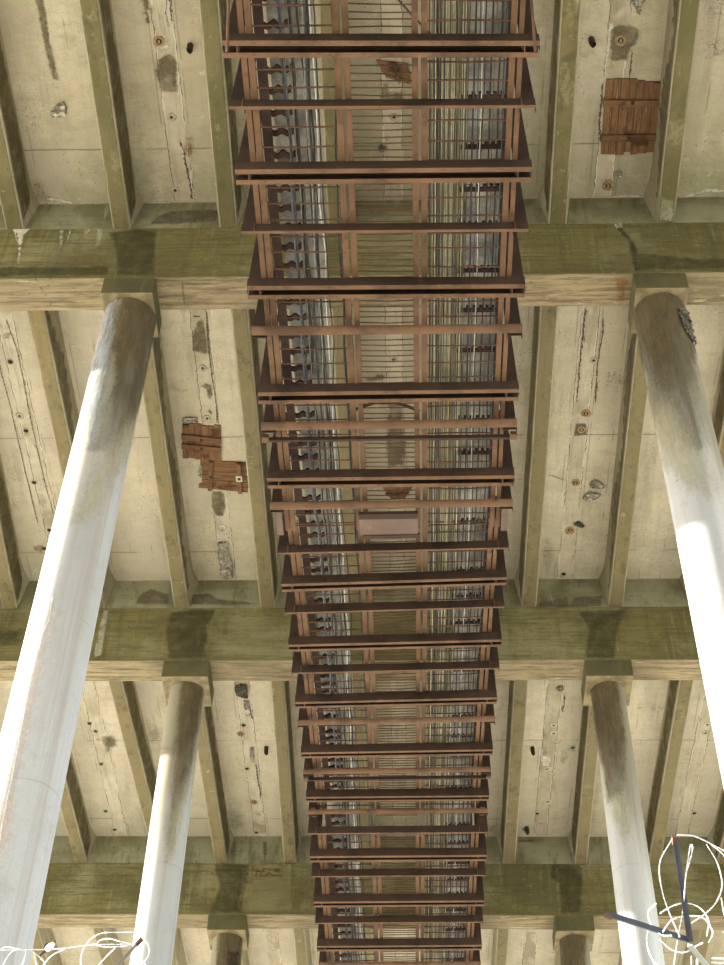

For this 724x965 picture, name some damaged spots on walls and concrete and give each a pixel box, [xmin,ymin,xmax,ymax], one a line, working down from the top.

crack [165,0,173,22]
leakage [0,44,99,255]
spalling [50,101,67,118]
leakage [101,0,136,217]
crack [179,140,193,199]
crack [576,310,605,403]
spalling [677,306,697,345]
crack [0,320,54,523]
leakage [87,297,250,658]
leakage [539,292,696,658]
spalling [217,542,234,579]
spalling [234,683,250,710]